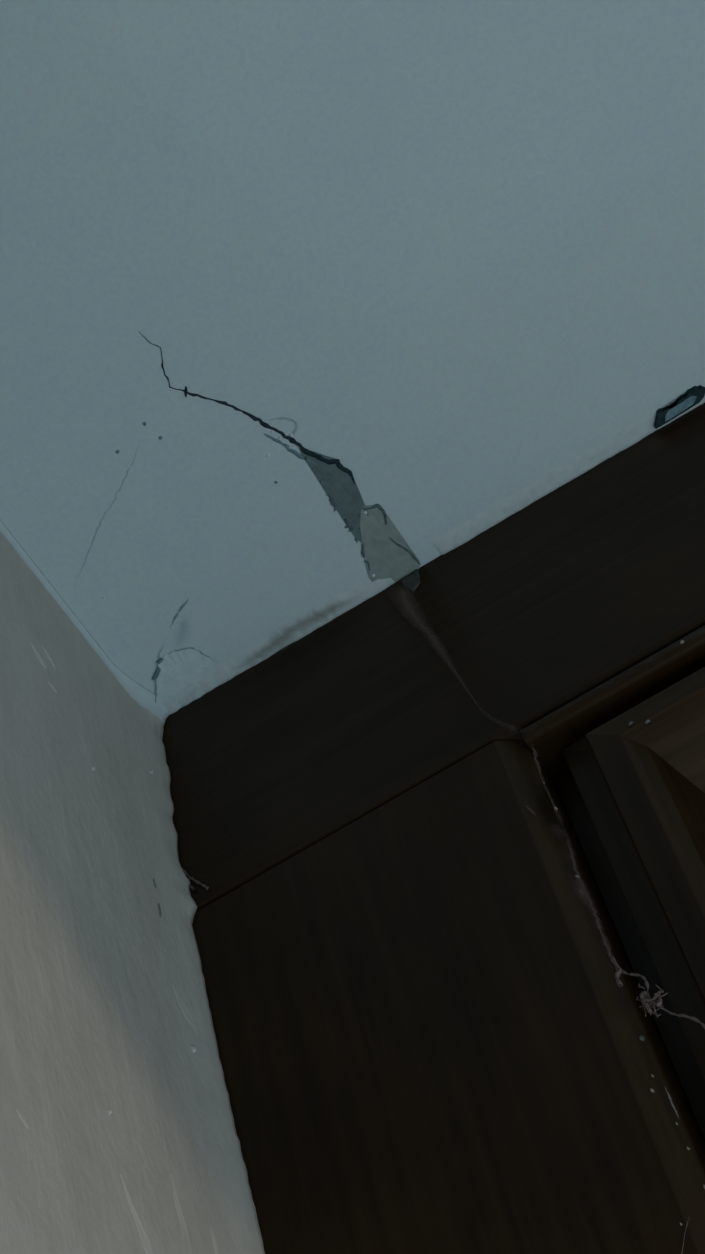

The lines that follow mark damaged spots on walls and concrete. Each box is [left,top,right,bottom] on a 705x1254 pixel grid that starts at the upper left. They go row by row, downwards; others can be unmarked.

crack [139,332,421,582]
spalling [654,385,705,429]